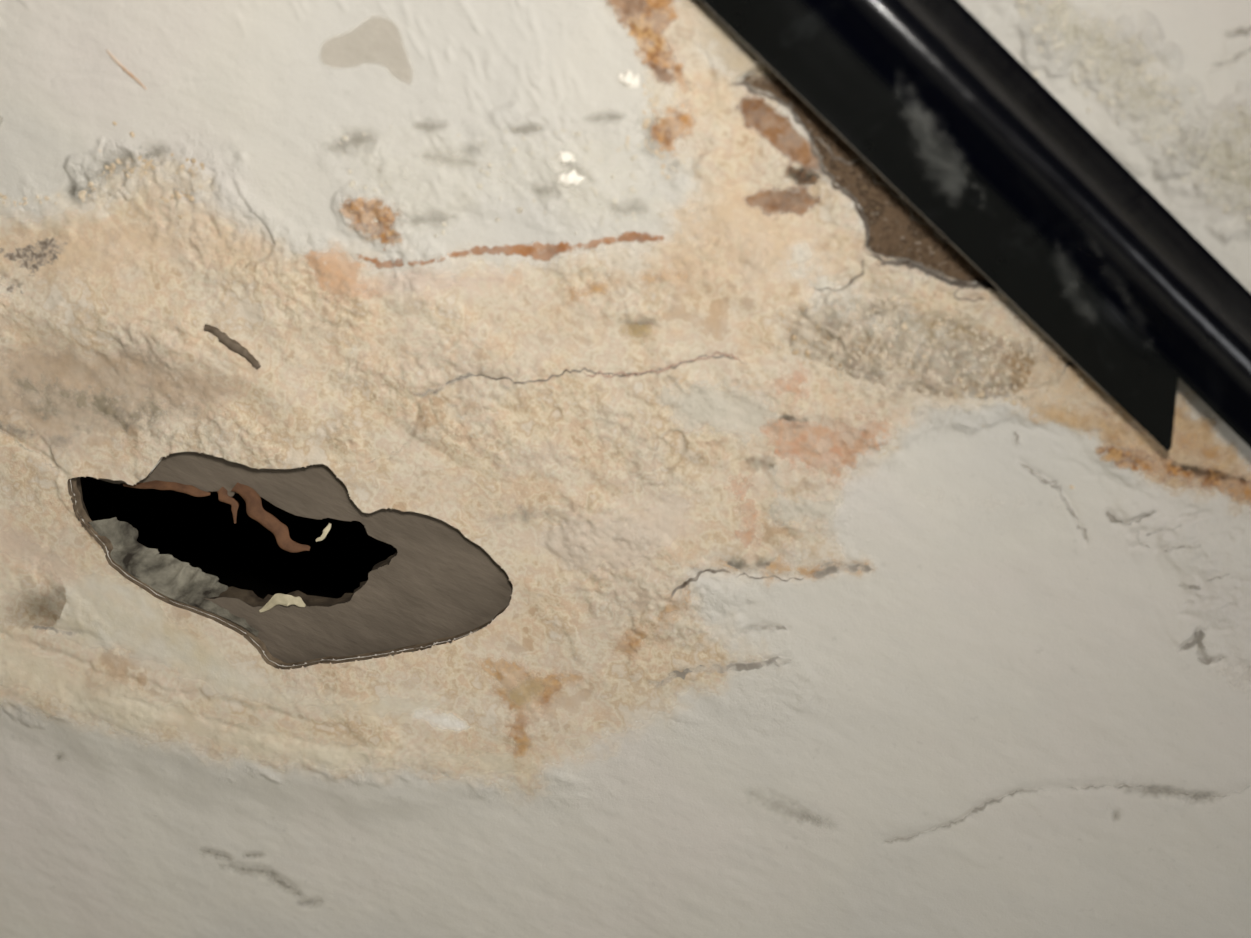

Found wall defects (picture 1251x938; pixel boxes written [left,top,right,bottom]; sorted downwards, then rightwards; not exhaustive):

corrosion [607,0,694,152]
flaking render [78,150,205,205]
spalling [338,134,372,151]
corrosion [341,198,664,269]
flaking render [537,151,585,195]
corrosion [736,95,822,215]
flaking render [729,67,992,291]
leakage [0,0,1057,794]
crack [446,351,746,384]
leakage [1003,352,1251,489]